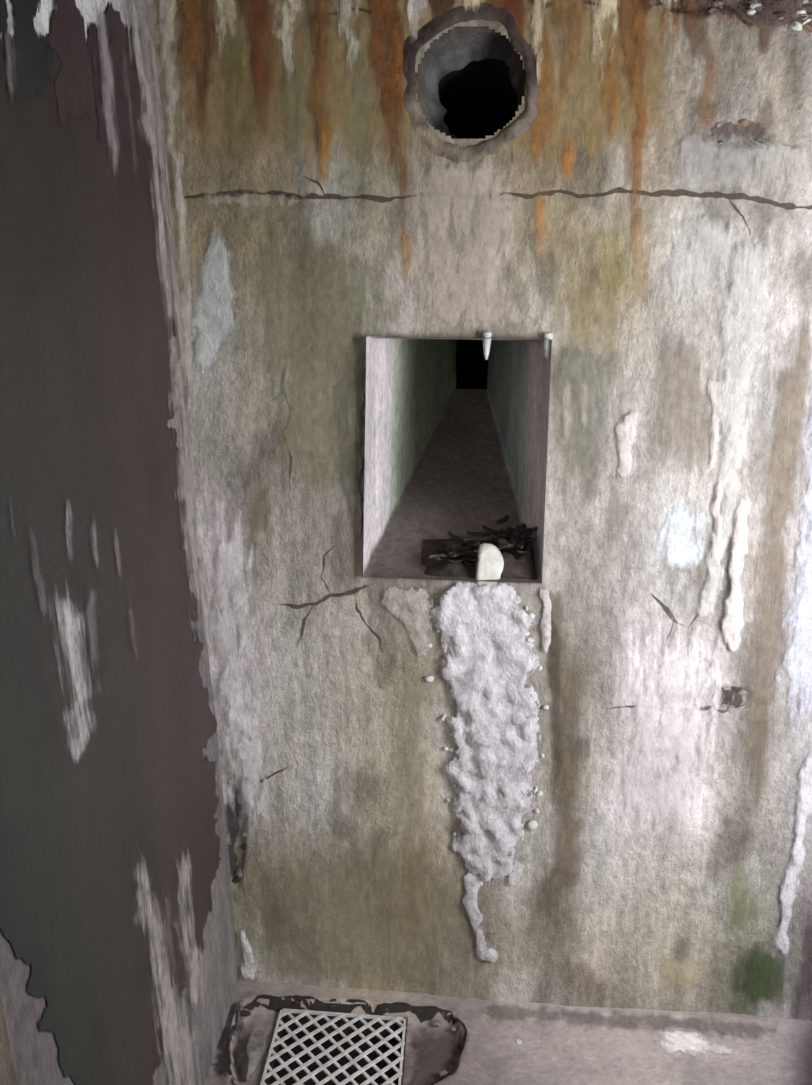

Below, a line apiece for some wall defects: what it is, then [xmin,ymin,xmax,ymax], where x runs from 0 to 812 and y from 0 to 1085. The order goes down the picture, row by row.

corrosion [369,0,406,186]
crack [183,177,812,235]
corrosion [492,0,586,152]
corrosion [603,0,653,201]
spalling [656,0,812,33]
water stain [675,135,812,189]
peeling [0,0,246,1085]
crack [280,545,383,652]
crack [343,335,366,535]
water stain [609,216,812,830]
water stain [380,582,581,963]
water stain [775,753,812,955]